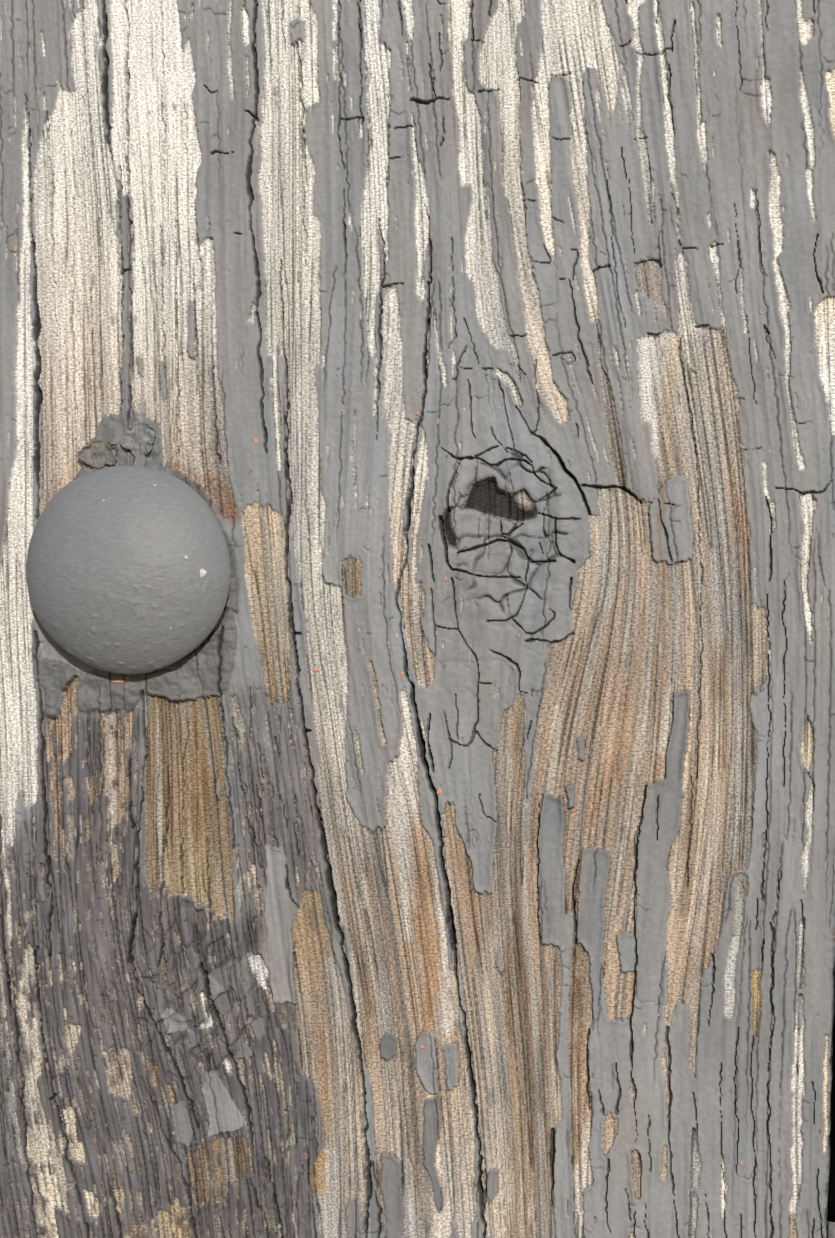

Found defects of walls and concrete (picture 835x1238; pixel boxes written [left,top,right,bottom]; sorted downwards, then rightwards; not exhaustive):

peeling [227,0,251,100]
crack [338,0,446,275]
crack [619,0,676,133]
peeling [0,911,86,1238]
crack [0,631,123,1238]
peeling [0,0,237,944]
peeling [161,972,233,1034]
peeling [130,1018,266,1238]
crack [26,0,382,1238]
peeling [243,0,768,1238]
crack [377,139,776,1238]
crack [586,481,835,1238]